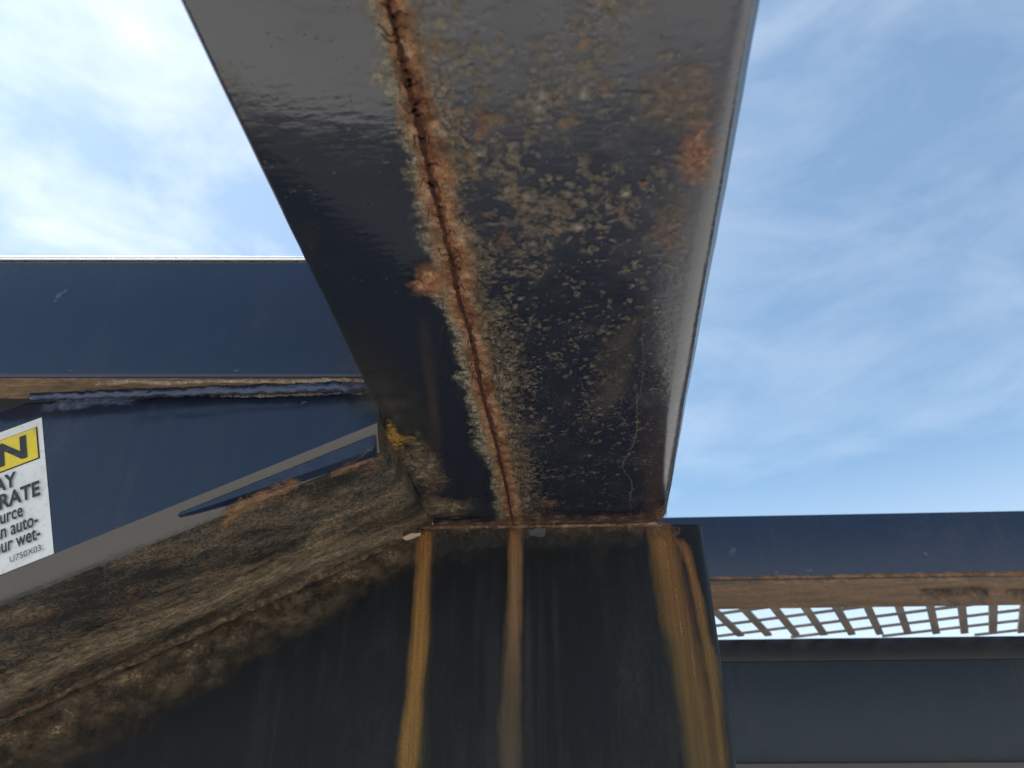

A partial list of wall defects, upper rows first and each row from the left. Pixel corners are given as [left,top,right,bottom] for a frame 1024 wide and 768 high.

corrosion [410,268,448,293]
peeling [95,378,364,398]
corrosion [386,424,413,450]
corrosion [224,480,298,525]
corrosion [388,501,1024,768]